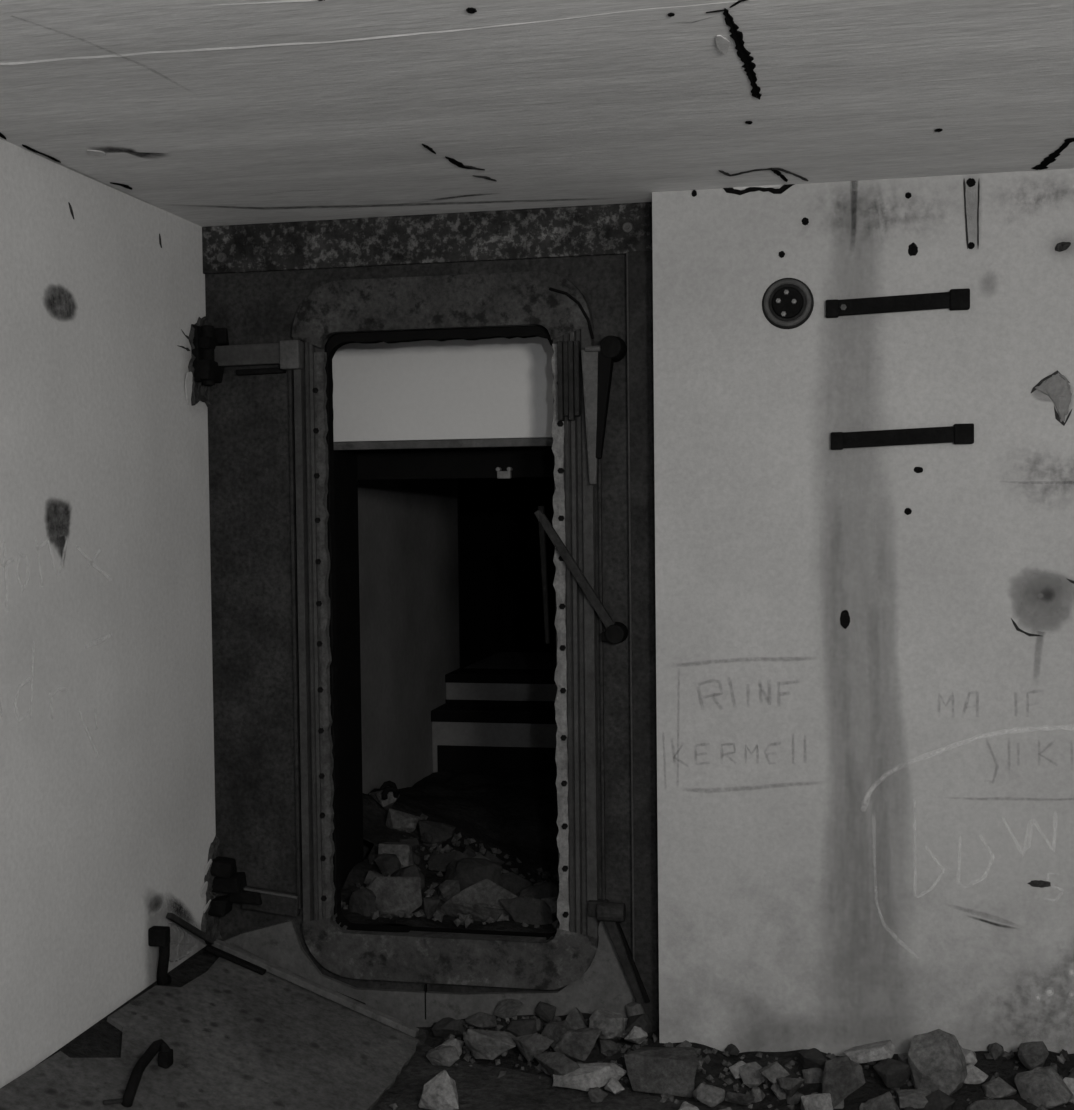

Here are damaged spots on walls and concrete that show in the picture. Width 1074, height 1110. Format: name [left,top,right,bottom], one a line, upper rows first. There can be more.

crack [692,0,762,100]
crack [422,144,496,200]
crack [1031,138,1074,170]
water stain [46,287,75,319]
peeling [1031,370,1073,426]